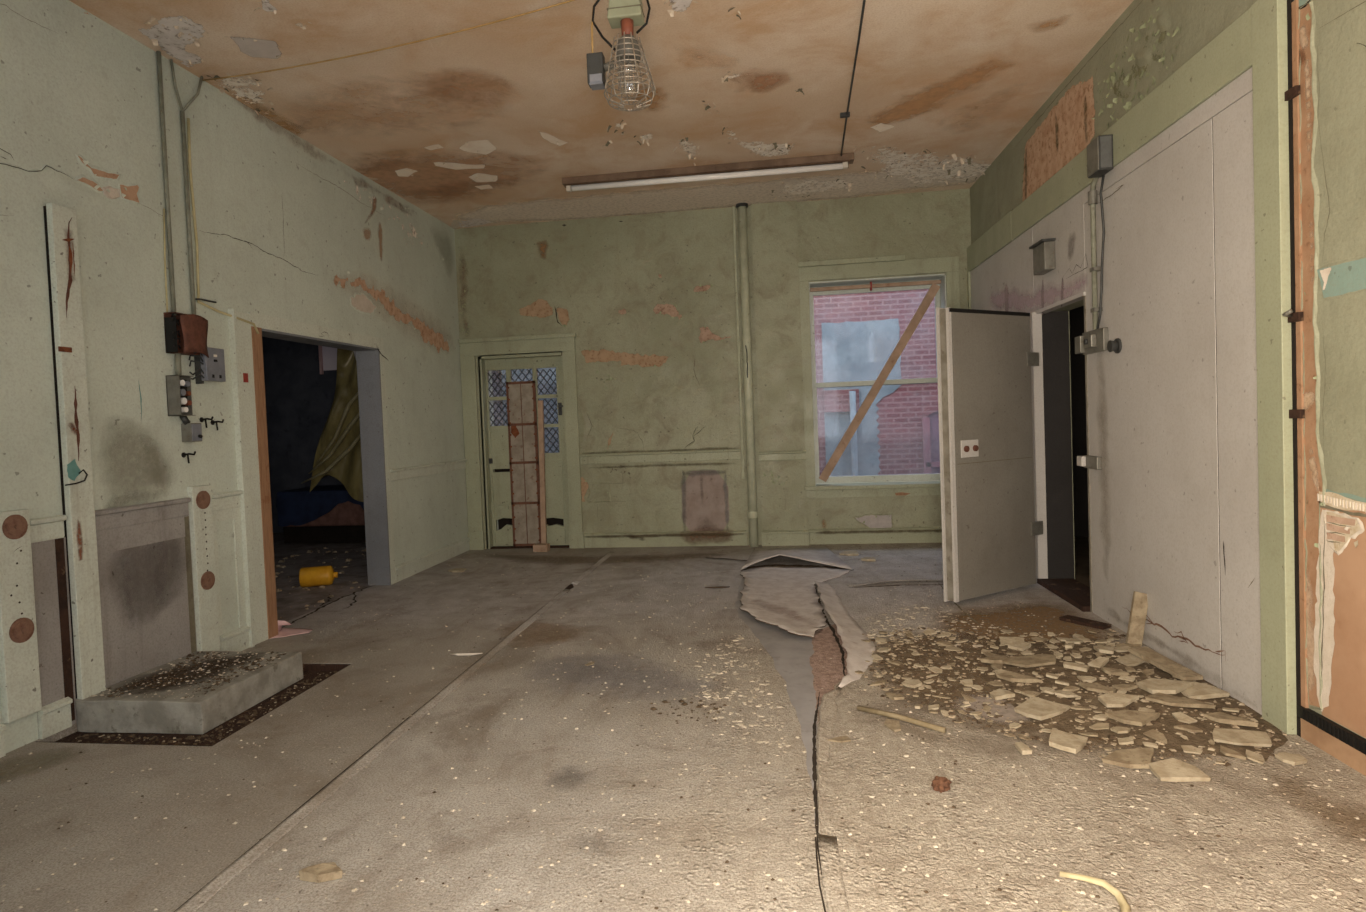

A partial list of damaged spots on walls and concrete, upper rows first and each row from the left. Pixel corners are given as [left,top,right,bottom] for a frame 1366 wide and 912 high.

peeling [138,15,274,115]
leakage [878,66,998,123]
crack [0,148,73,179]
leakage [363,155,519,199]
leakage [463,166,986,221]
peeling [770,123,993,201]
peeling [1022,77,1095,202]
crack [202,202,315,275]
peeling [334,271,450,353]
flaking render [1298,1,1364,710]